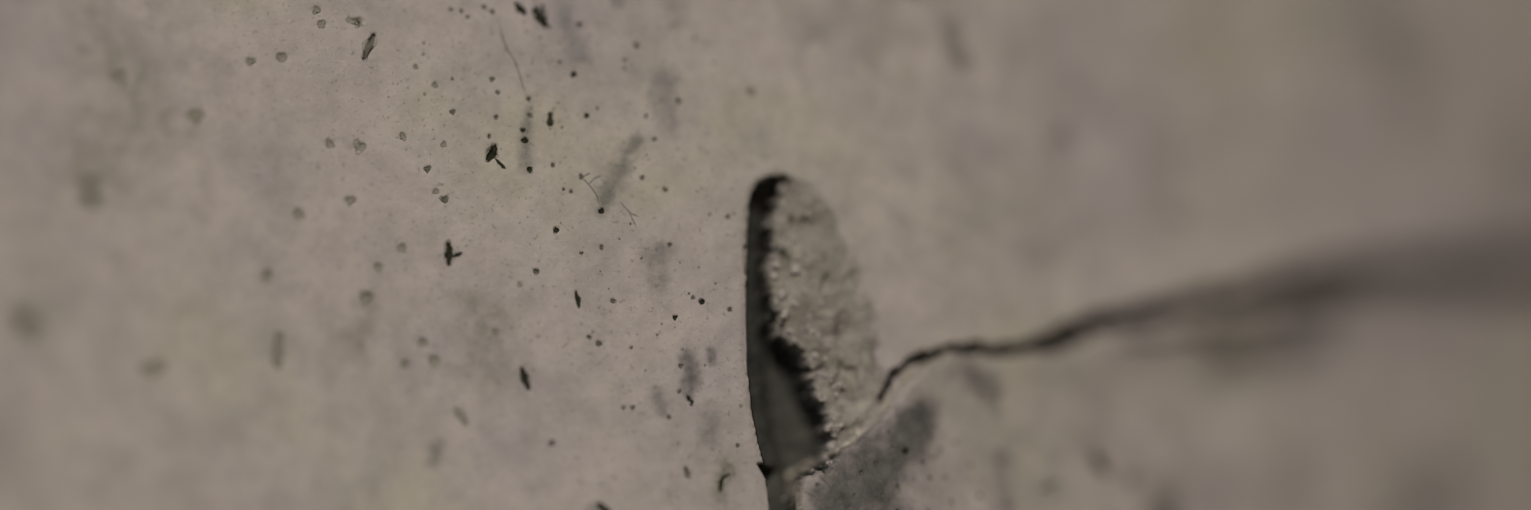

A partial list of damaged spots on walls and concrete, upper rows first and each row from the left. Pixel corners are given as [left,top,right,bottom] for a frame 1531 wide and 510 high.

spalling [763,185,882,464]
crack [744,178,1531,510]